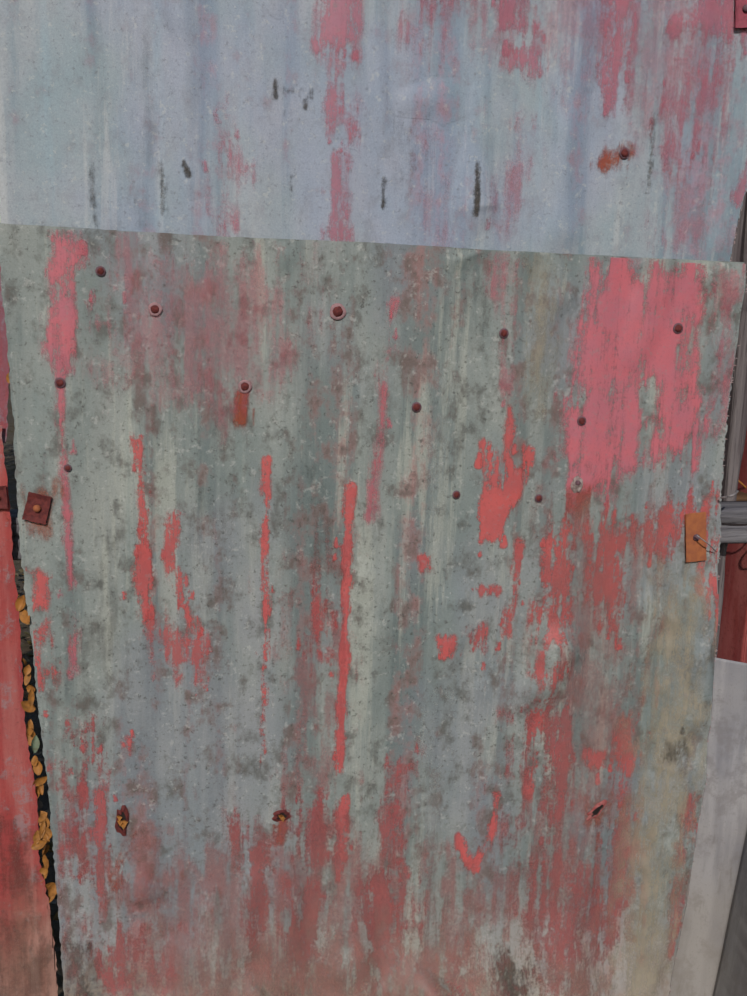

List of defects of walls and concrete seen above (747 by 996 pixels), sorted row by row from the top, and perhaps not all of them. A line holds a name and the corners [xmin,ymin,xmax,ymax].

rust [597,145,634,172]
rust [233,390,254,426]
peeling [454,257,720,996]
peeling [436,634,457,661]